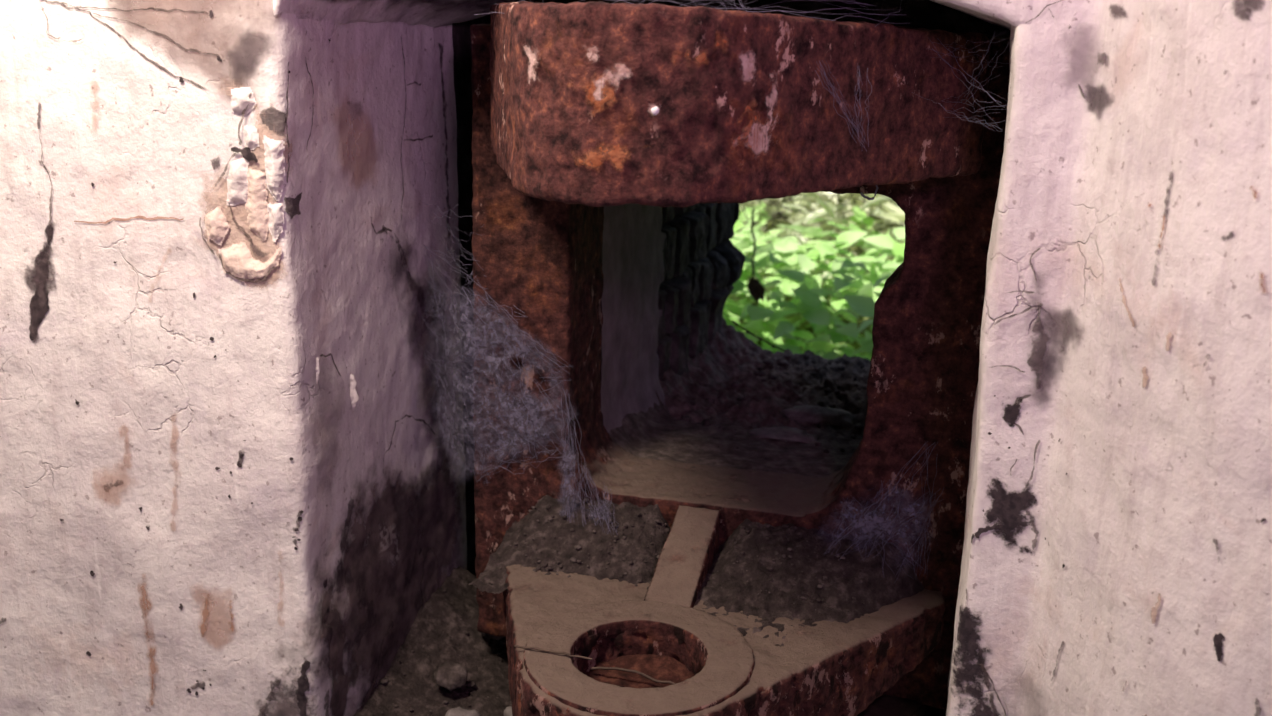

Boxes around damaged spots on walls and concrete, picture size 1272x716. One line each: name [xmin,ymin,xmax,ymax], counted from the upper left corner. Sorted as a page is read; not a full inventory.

crack [44,0,218,89]
rust [569,75,615,114]
peeling [199,79,302,286]
rust [578,143,628,169]
water stain [994,248,1079,405]
rust [140,585,156,705]
water stain [187,670,212,696]
rust [201,599,209,636]
water stain [258,458,464,716]